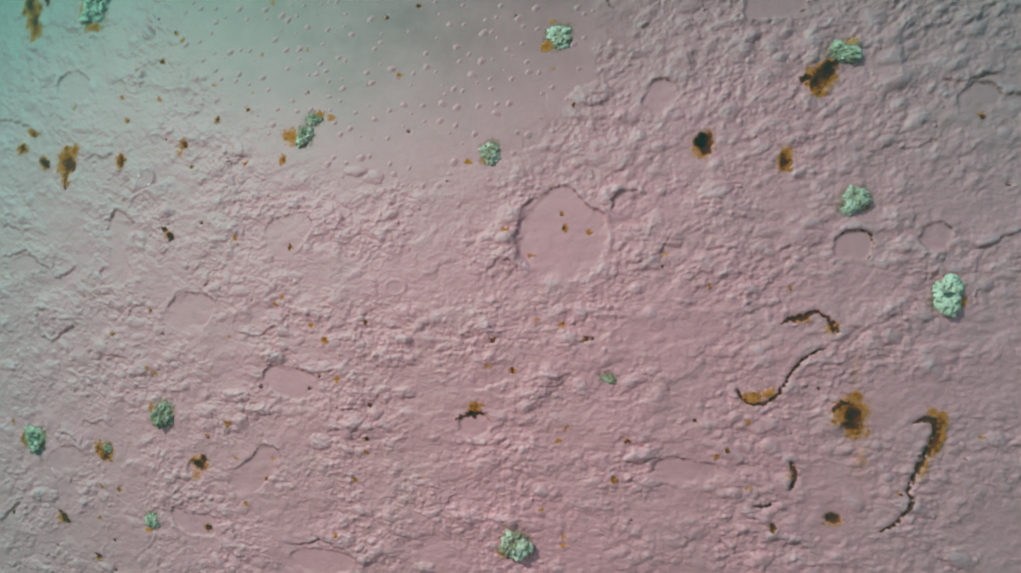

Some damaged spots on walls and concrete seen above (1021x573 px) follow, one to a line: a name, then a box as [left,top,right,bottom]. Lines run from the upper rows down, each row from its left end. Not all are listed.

corrosion [21,0,50,42]
corrosion [799,59,838,97]
corrosion [39,143,79,190]
spalling [481,183,655,280]
crack [966,224,1021,249]
crack [737,310,840,406]
crack [880,408,949,533]